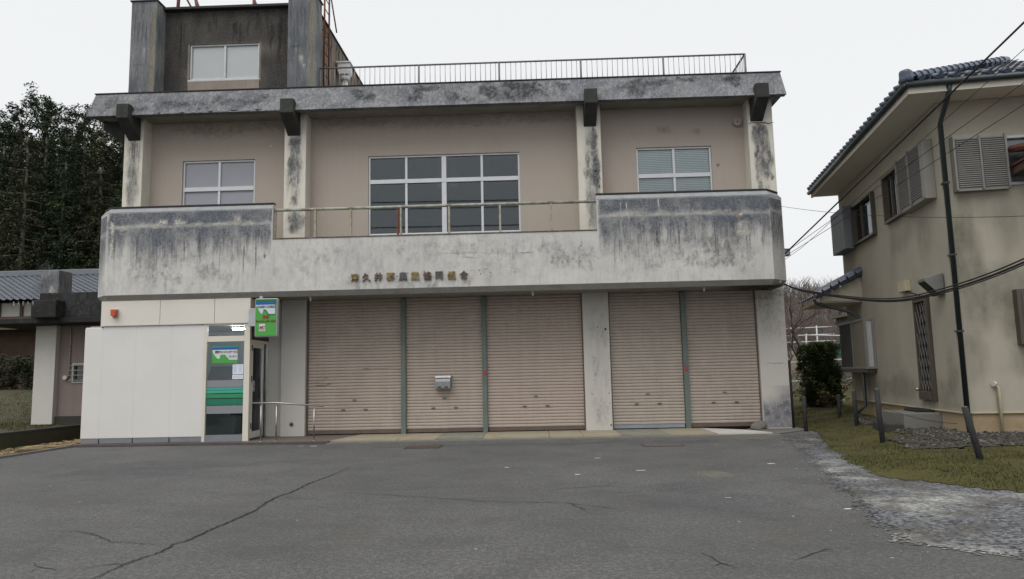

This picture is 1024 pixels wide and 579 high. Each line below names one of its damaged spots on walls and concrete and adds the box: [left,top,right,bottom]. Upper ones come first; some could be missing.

water stain [480,82,548,100]
water stain [586,125,782,250]
water stain [100,210,272,258]